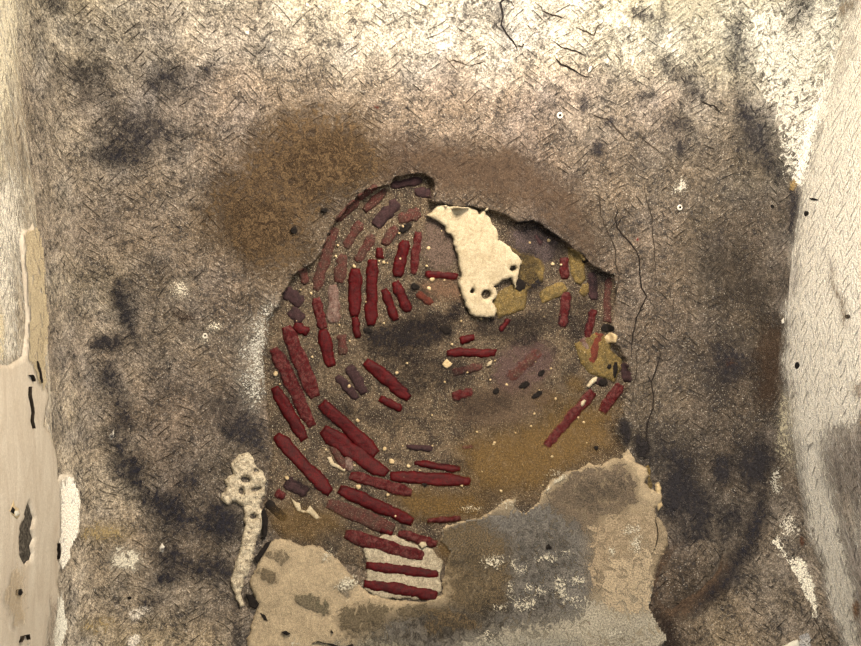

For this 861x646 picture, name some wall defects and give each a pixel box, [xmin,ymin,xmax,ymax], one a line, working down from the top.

crack [499,0,524,54]
crack [541,10,604,78]
water stain [201,100,602,278]
spalling [260,173,632,601]
crack [595,184,662,457]
peeling [732,0,861,646]
spalling [9,500,32,564]